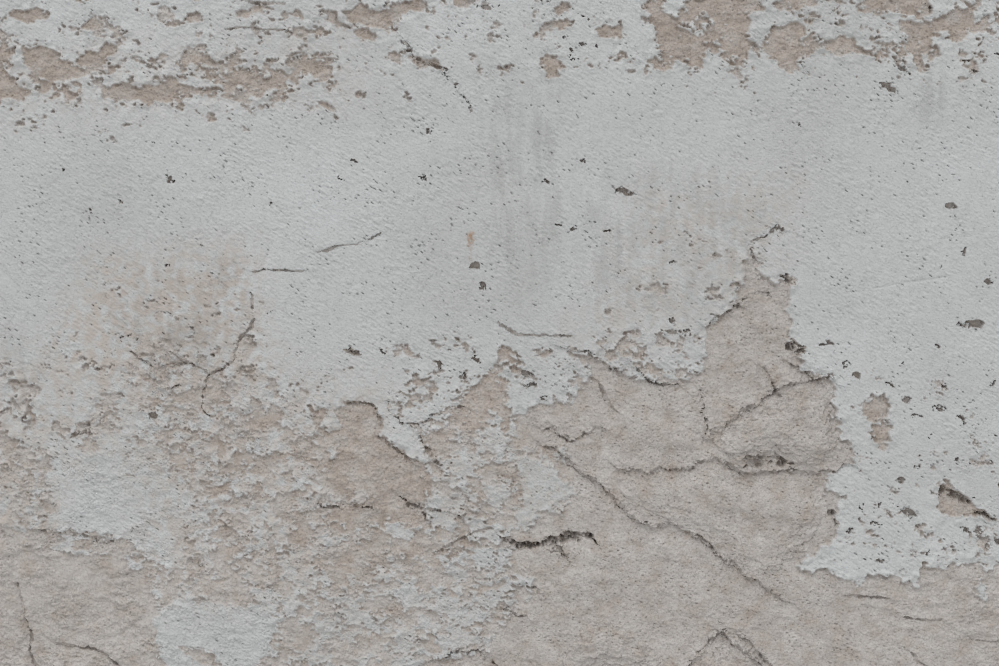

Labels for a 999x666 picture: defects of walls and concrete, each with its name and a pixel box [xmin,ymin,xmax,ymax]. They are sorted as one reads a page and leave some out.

peeling [0,0,500,120]
peeling [533,0,629,79]
peeling [641,0,999,88]
peeling [0,255,999,666]
crack [497,321,854,600]
crack [17,582,120,666]
crack [418,647,498,666]
crack [504,608,527,618]
crack [688,628,772,666]